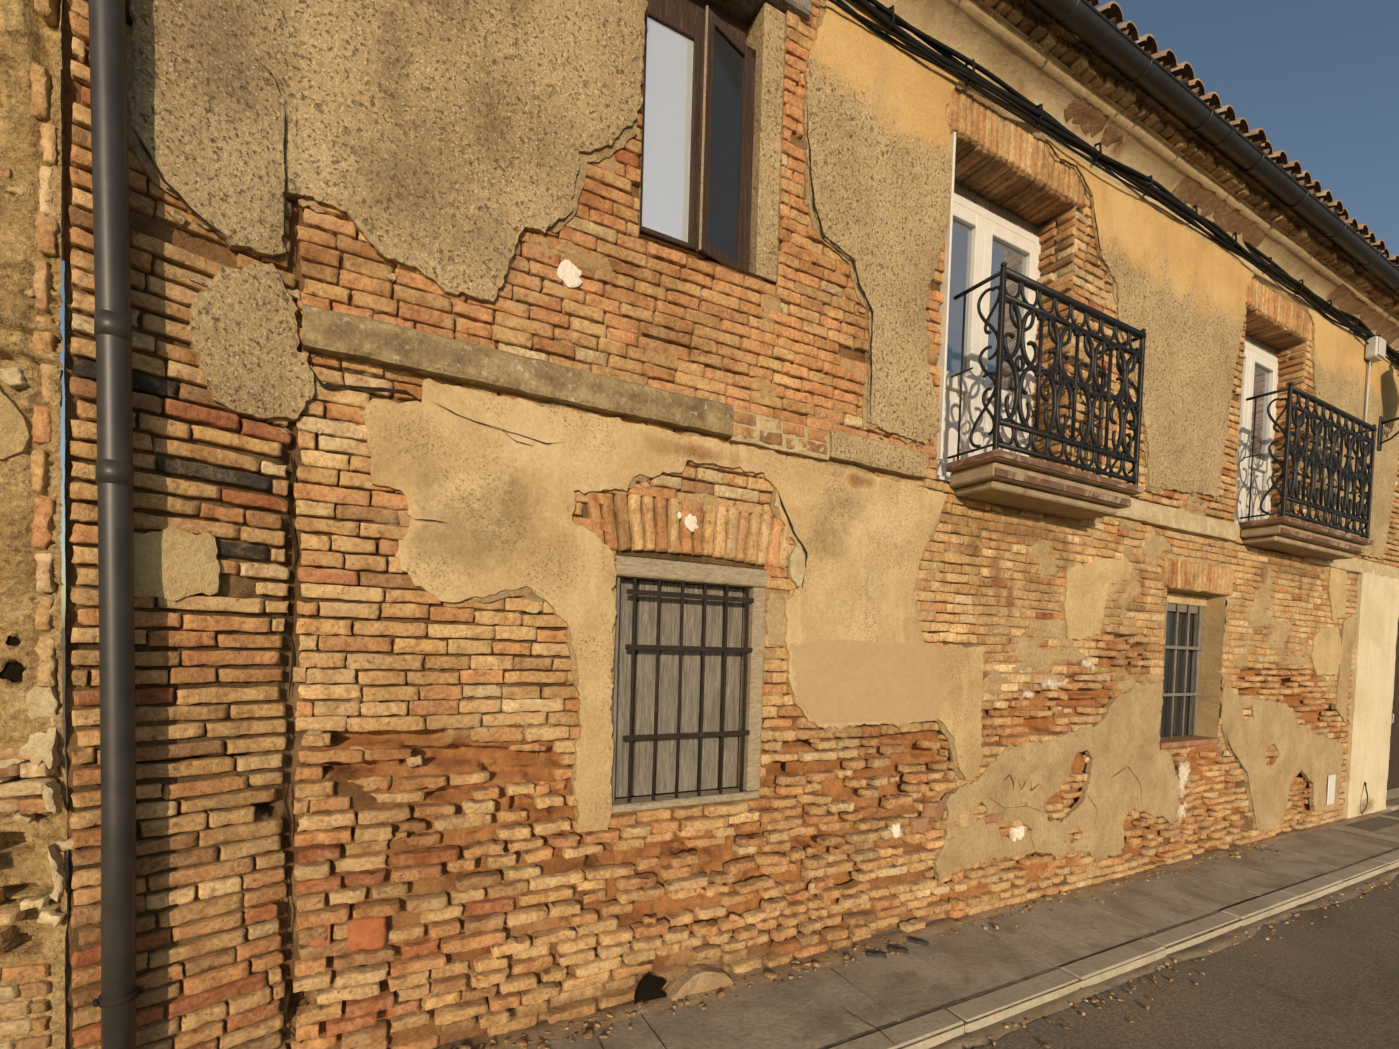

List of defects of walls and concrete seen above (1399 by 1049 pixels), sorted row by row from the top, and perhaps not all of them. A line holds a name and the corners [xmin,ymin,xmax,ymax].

flaking render [126,0,648,434]
flaking render [1302,309,1399,560]
flaking render [295,378,1355,952]
spalling [0,777,63,824]
spalling [20,838,76,928]